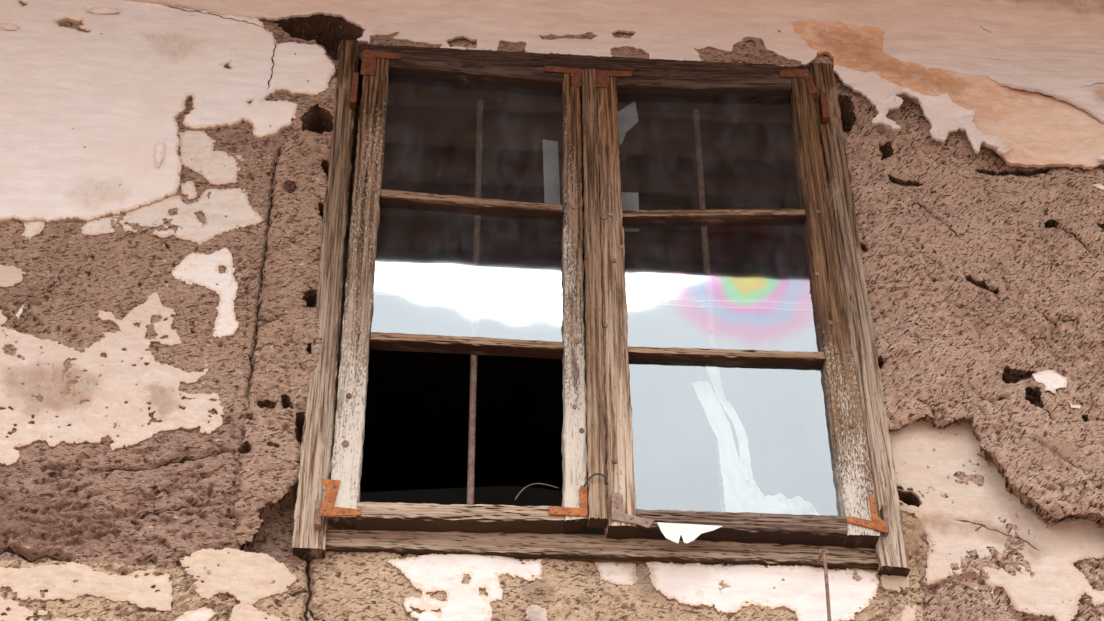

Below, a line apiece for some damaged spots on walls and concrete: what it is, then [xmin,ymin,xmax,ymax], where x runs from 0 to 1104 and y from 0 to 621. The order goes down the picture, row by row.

spalling [0,413,299,621]
peeling [0,0,339,551]
crack [247,159,282,397]
spalling [253,16,1104,621]